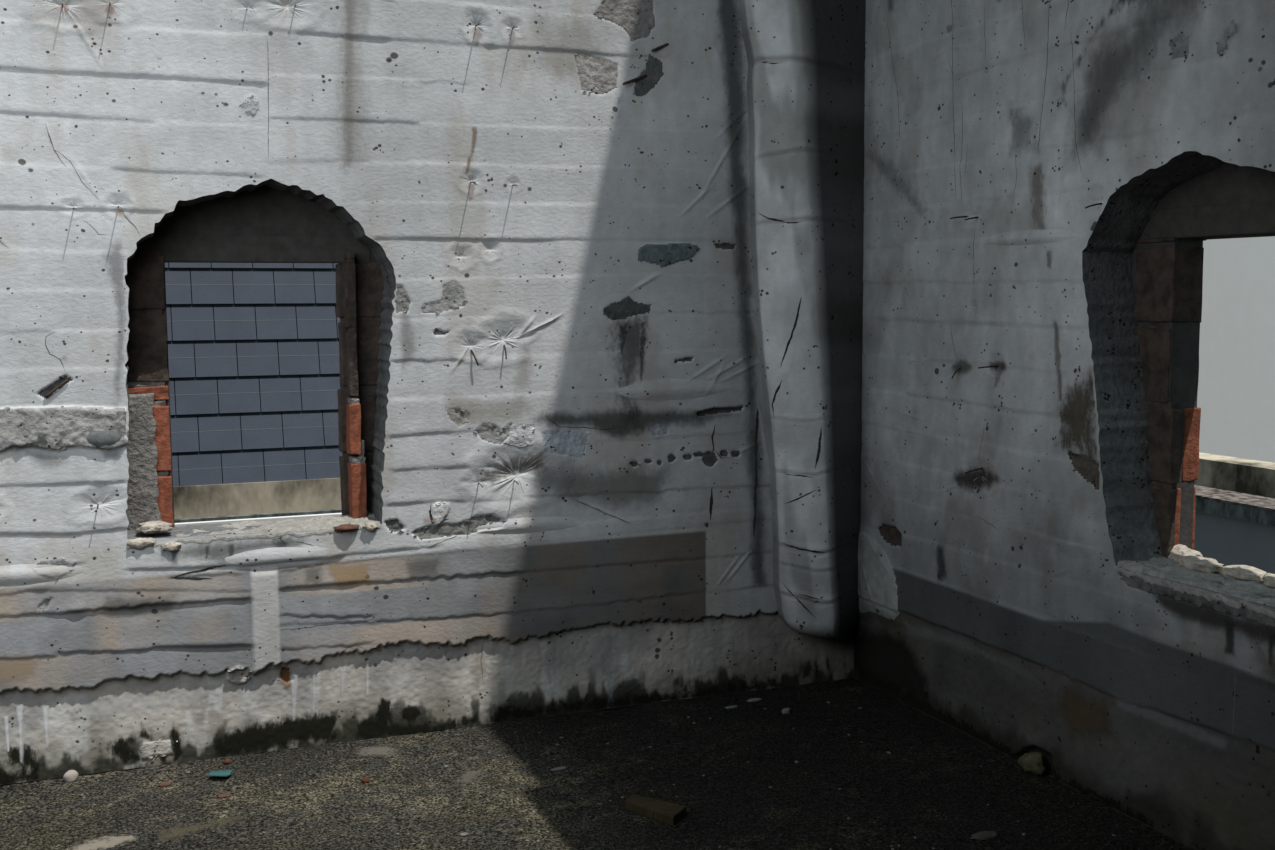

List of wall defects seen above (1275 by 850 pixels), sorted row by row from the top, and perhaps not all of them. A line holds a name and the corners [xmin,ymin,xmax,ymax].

spalling [593,0,655,41]
spalling [575,54,618,94]
spalling [633,54,664,96]
damp [1081,0,1173,139]
spalling [0,375,126,451]
spalling [1067,450,1100,490]
damp [4,705,23,761]
damp [170,726,182,760]
damp [358,747,398,756]